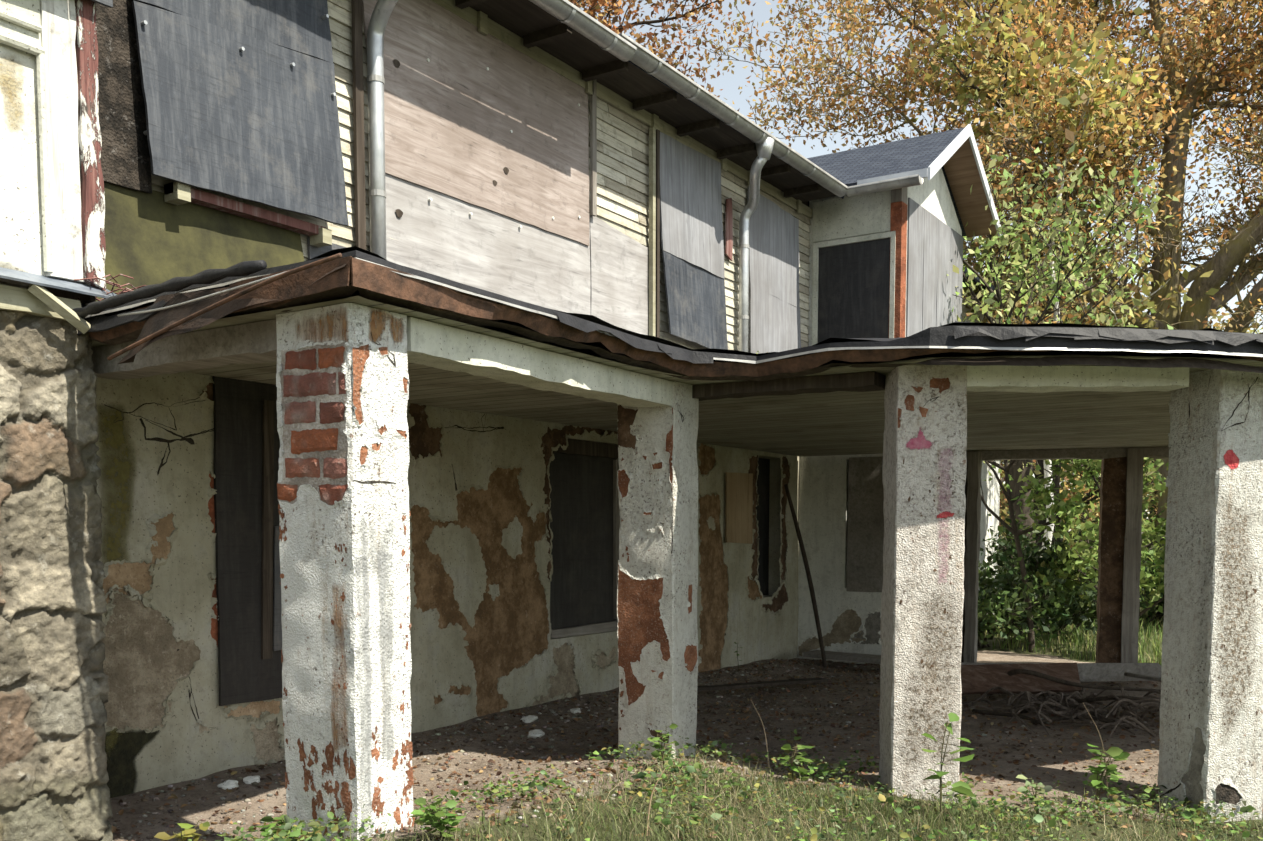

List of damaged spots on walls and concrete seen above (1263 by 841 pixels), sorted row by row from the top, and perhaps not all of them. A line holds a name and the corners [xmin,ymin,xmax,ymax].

leakage [99,407,134,563]
leakage [105,728,159,798]
crack [104,397,214,475]
peeling [102,510,219,733]
peeling [217,687,356,839]
flaking render [276,338,445,542]
leakage [356,526,393,839]
peeling [371,690,415,834]
peeling [400,404,673,717]
peeling [591,443,730,730]
peeling [745,452,791,616]
peeling [797,607,882,658]